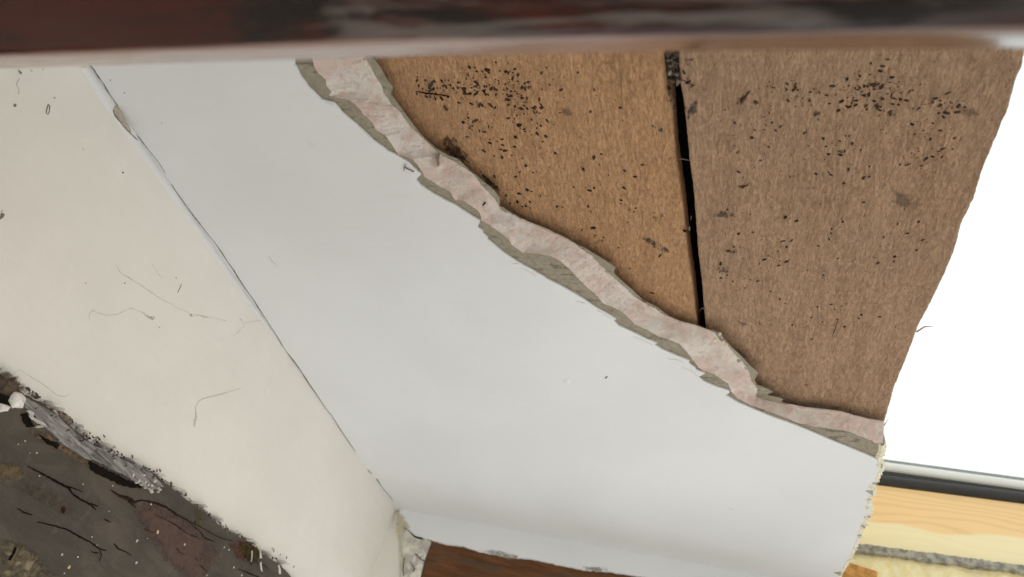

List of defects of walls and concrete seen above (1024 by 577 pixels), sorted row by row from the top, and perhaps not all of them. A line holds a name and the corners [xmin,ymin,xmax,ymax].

damp [416,61,637,249]
damp [716,58,970,185]
spalling [295,58,887,577]
damp [719,232,847,340]
peeling [0,540,49,577]
crack [17,465,232,572]
peeling [0,387,294,567]